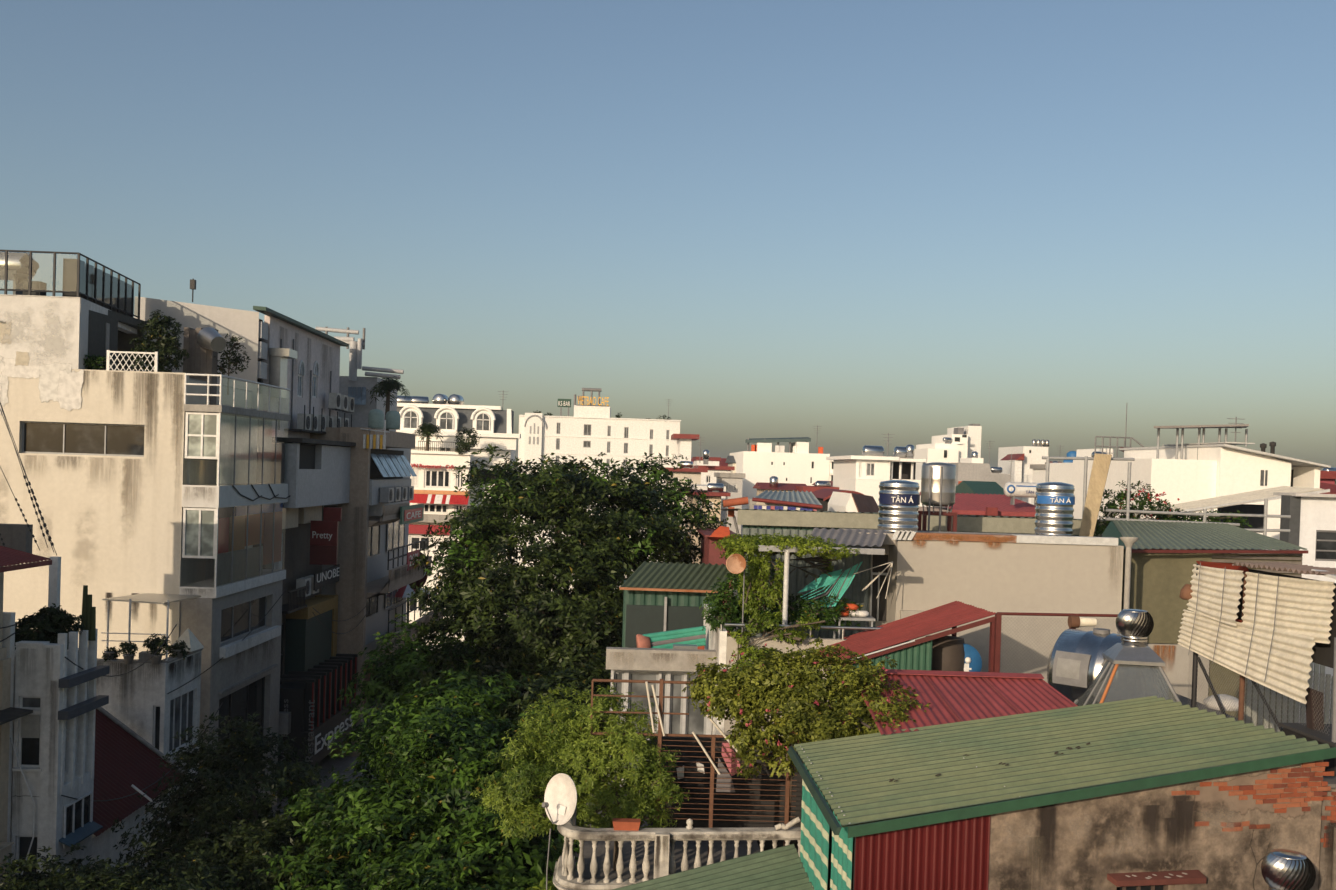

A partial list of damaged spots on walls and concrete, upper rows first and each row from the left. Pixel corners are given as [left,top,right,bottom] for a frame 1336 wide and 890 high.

peeling [0,321,84,414]
water stain [147,374,157,417]
water stain [174,374,182,416]
water stain [1000,804,1057,890]
water stain [1067,796,1227,890]
spalling [1171,762,1336,847]